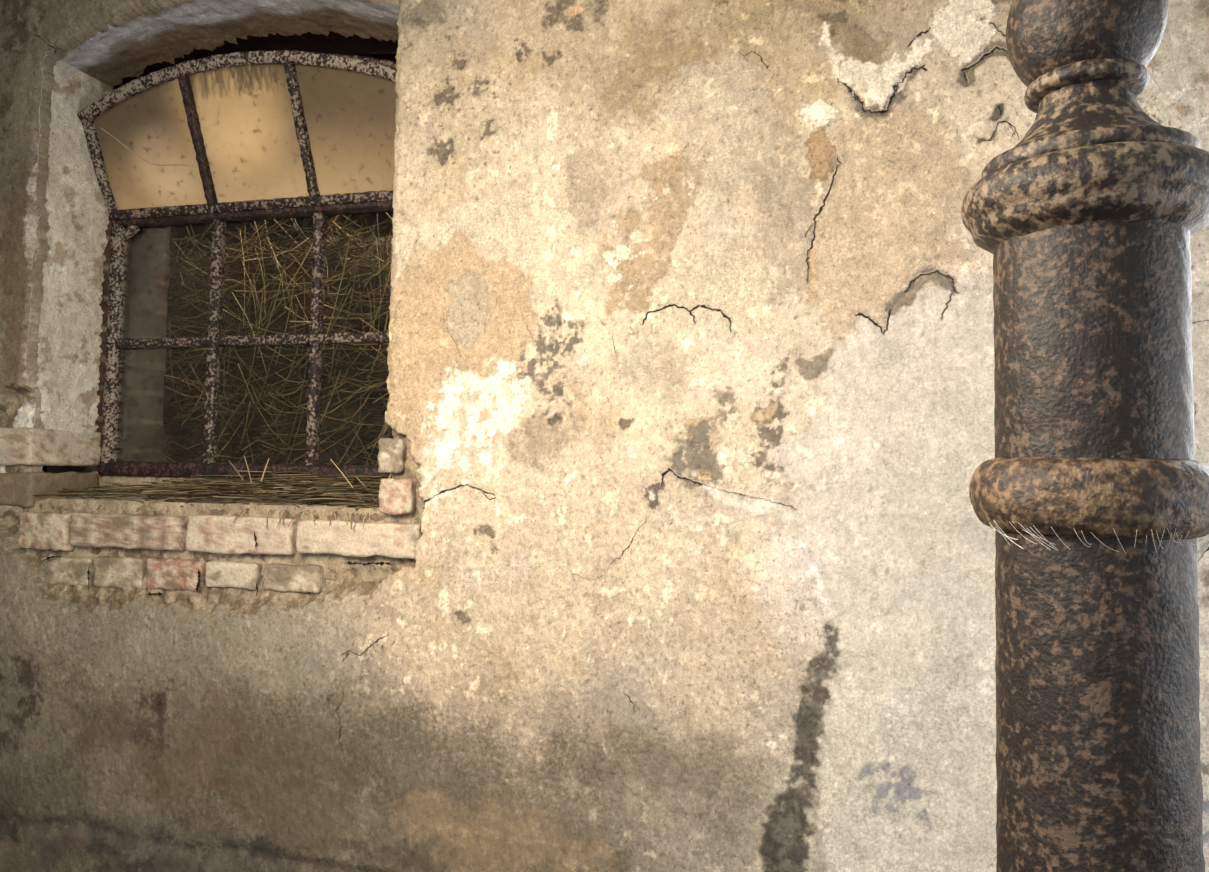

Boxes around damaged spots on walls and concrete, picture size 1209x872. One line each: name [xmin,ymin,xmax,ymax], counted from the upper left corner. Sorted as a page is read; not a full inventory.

spalling [434,54,495,106]
spalling [428,136,456,166]
crack [804,156,842,283]
crack [642,303,732,333]
crack [855,268,960,334]
spalling [0,145,606,615]
peeling [599,0,1009,872]
crack [660,467,797,510]
leakage [0,655,560,872]
leakage [792,687,820,768]
peeling [1197,534,1209,872]
leakage [764,796,809,872]